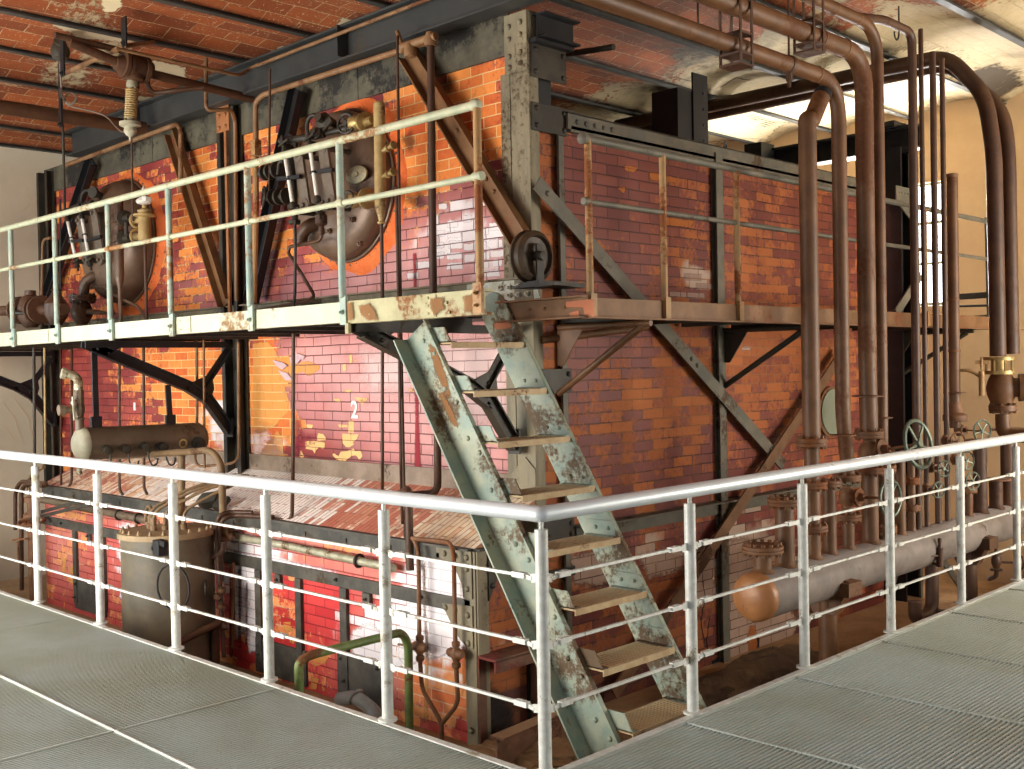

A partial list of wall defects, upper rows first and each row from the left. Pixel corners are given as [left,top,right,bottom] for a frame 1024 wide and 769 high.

peeling [101,0,122,12]
peeling [53,25,134,43]
peeling [152,60,186,78]
corrosion [347,302,377,321]
corrosion [430,296,444,316]
corrosion [462,294,473,312]
corrosion [428,344,458,427]
peeling [253,342,320,456]
peeling [299,422,362,461]
peeling [309,656,328,691]